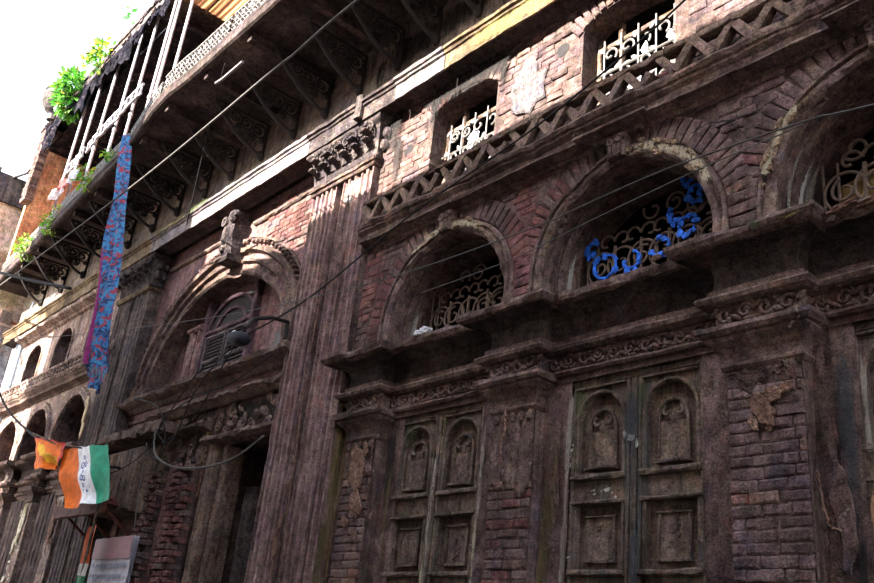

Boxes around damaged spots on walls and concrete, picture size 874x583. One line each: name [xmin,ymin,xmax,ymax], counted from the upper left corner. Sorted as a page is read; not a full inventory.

peeling [625,137,711,182]
flaking render [747,380,793,432]
peeling [341,442,369,541]
peeling [823,413,859,583]